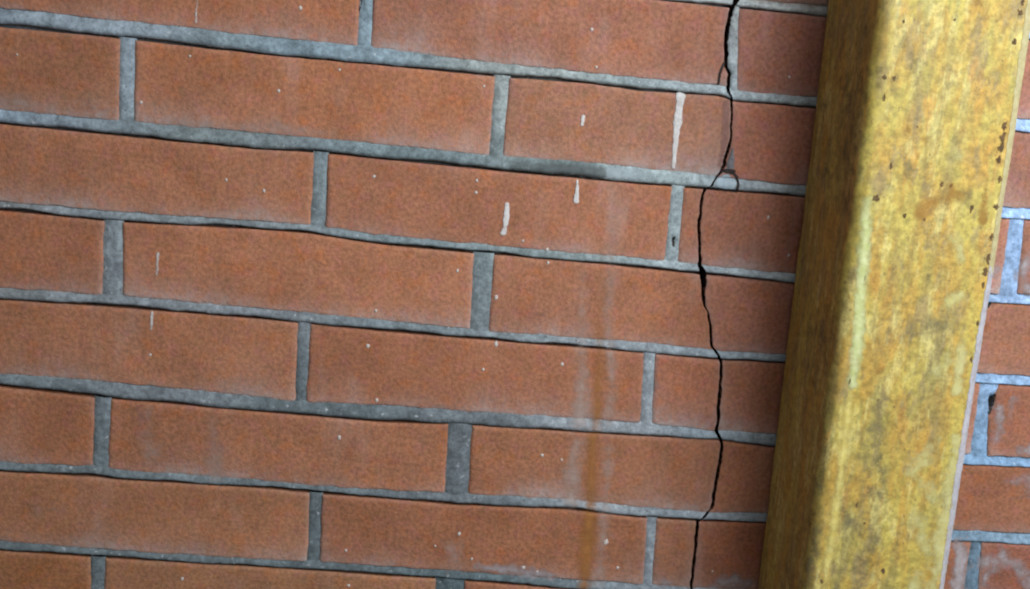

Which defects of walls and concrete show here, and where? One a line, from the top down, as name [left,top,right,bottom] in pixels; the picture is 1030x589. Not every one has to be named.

water stain [672,92,686,169]
crack [690,0,740,589]